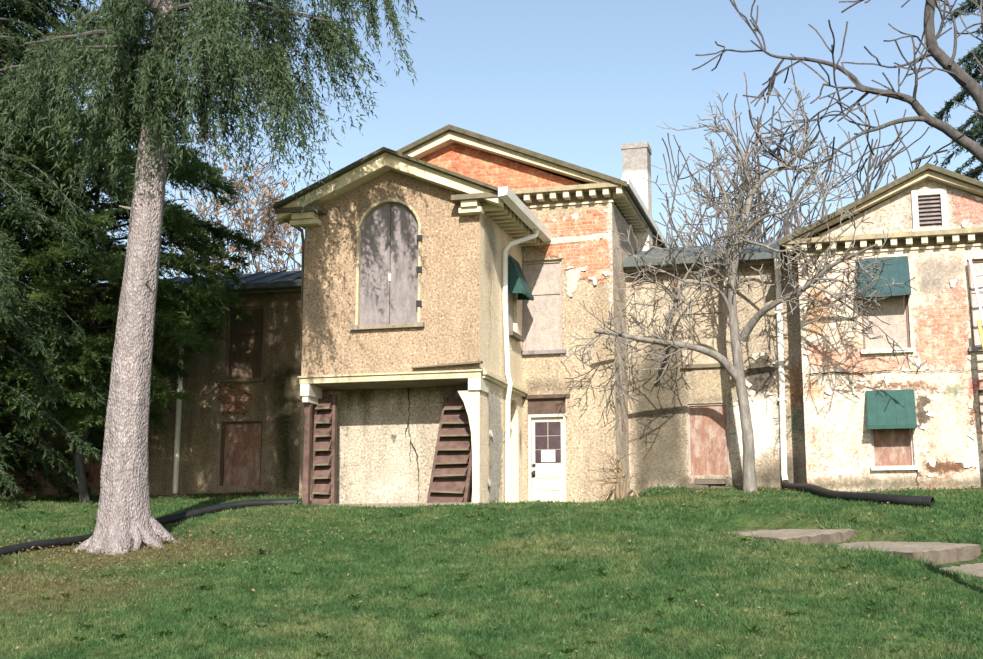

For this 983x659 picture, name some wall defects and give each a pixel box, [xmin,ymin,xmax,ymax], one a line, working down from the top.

flaking render [536,208,612,299]
crack [405,388,419,499]
peeling [731,352,780,458]
flaking render [801,276,975,429]